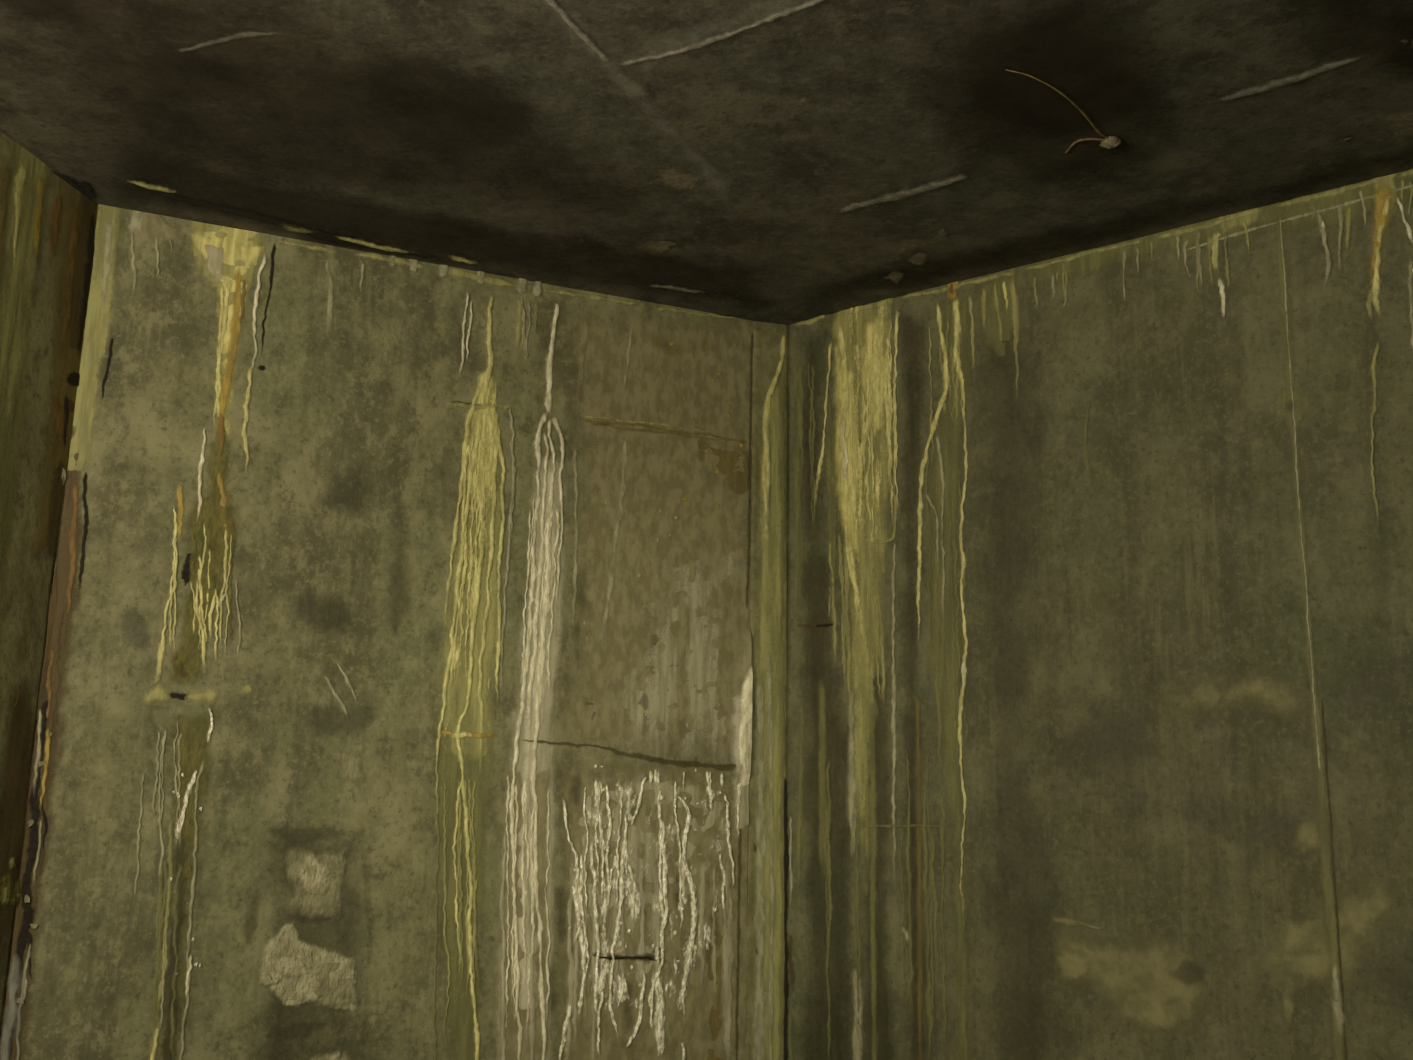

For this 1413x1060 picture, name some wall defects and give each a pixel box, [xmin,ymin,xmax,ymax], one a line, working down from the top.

leakage [357,253,422,287]
corrosion [0,142,98,1060]
leakage [433,169,1413,1060]
crack [441,730,492,738]
crack [526,740,734,789]
leakage [134,709,213,1060]
spalling [260,850,359,1010]